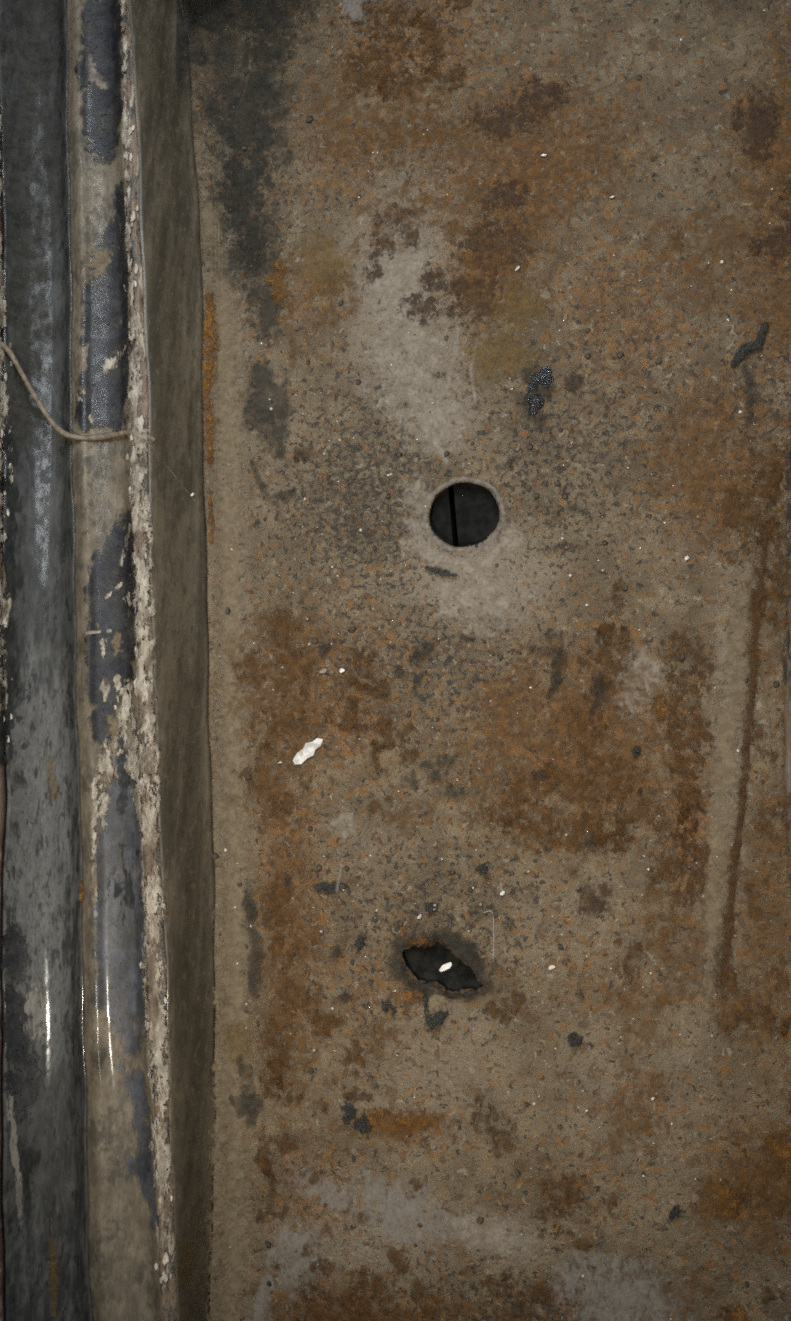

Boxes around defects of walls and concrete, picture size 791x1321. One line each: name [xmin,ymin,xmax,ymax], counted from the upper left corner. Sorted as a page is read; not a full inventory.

rust [473,76,576,141]
rust [363,207,419,281]
rust [398,180,532,329]
peeling [74,0,174,1283]
rust [232,607,419,820]
rust [480,577,714,905]
rust [714,444,791,1041]
rust [575,877,612,916]
rust [259,872,345,1102]
rust [313,1040,439,1140]
rust [254,1134,299,1221]
rust [293,1237,441,1321]